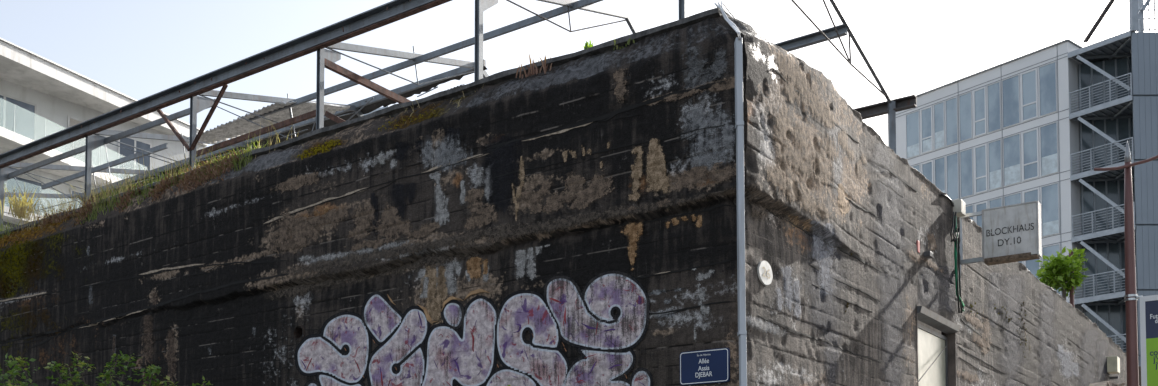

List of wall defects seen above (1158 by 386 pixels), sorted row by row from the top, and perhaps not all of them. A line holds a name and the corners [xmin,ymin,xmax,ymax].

crack [0,260,289,349]
damp [299,183,416,263]
damp [373,128,521,228]
spalling [266,53,839,301]
damp [682,109,735,167]
damp [777,221,844,386]
damp [871,143,957,386]
damp [987,272,1025,386]
damp [1037,290,1110,386]